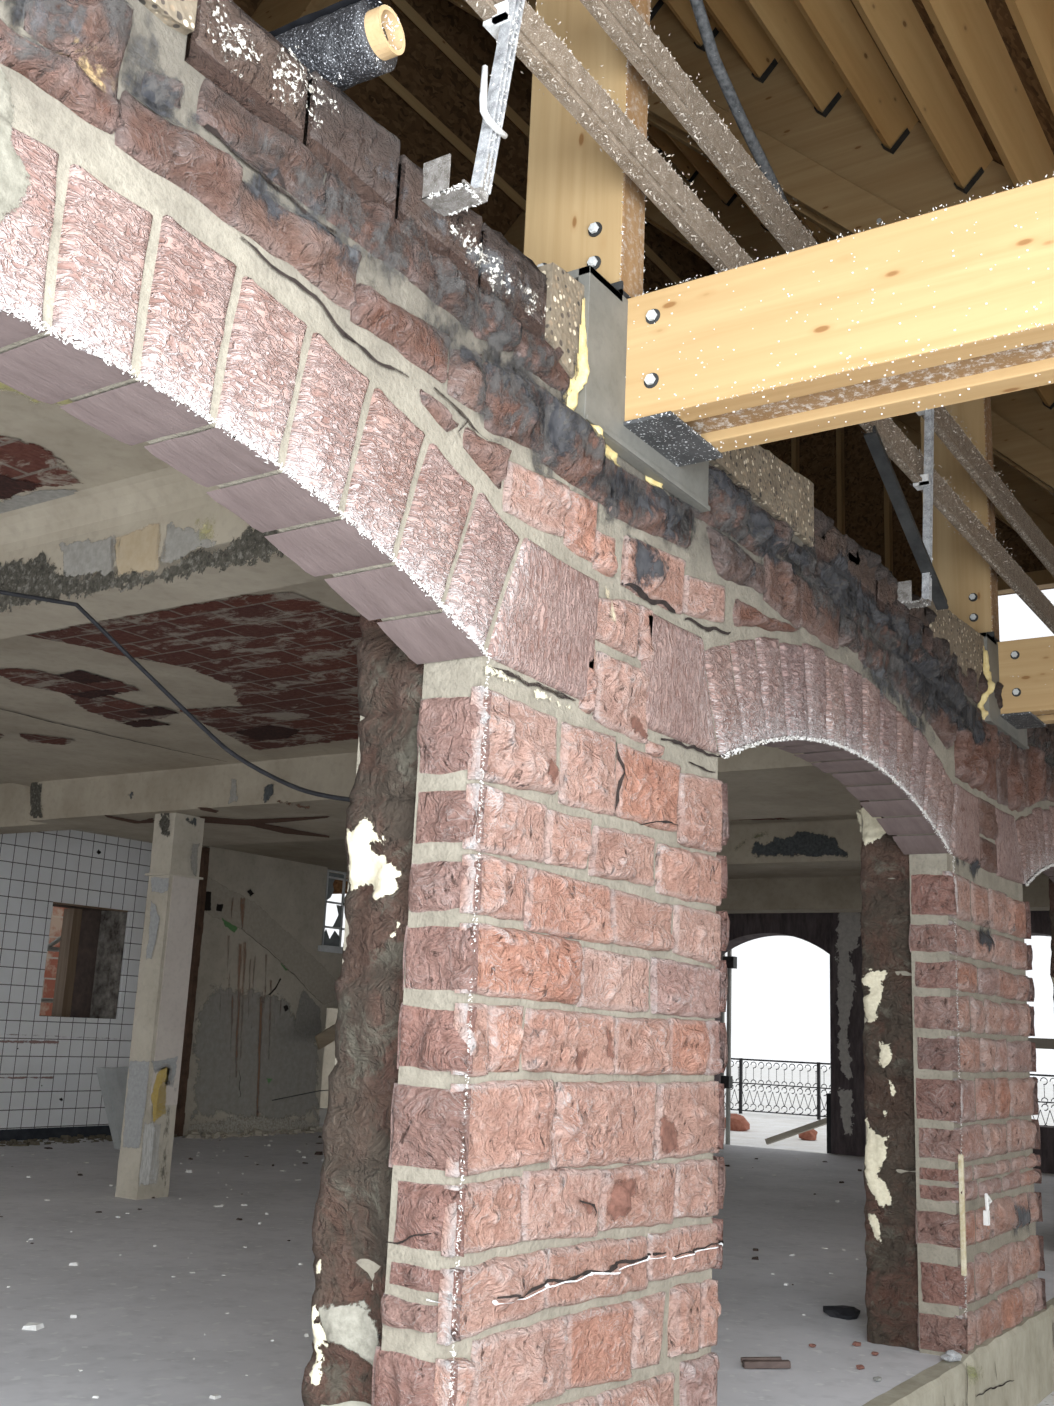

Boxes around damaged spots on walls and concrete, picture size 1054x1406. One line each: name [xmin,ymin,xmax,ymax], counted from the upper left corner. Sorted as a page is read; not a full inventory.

crack [241,237,498,444]
flaking render [0,436,84,500]
flaking render [0,592,362,750]
spalling [105,815,154,824]
spalling [197,779,330,838]
flaking render [346,818,401,900]
crack [615,741,677,825]
flaking render [856,808,886,847]
flaking render [834,912,896,1242]
crack [492,1242,723,1305]
crack [944,1363,1014,1401]